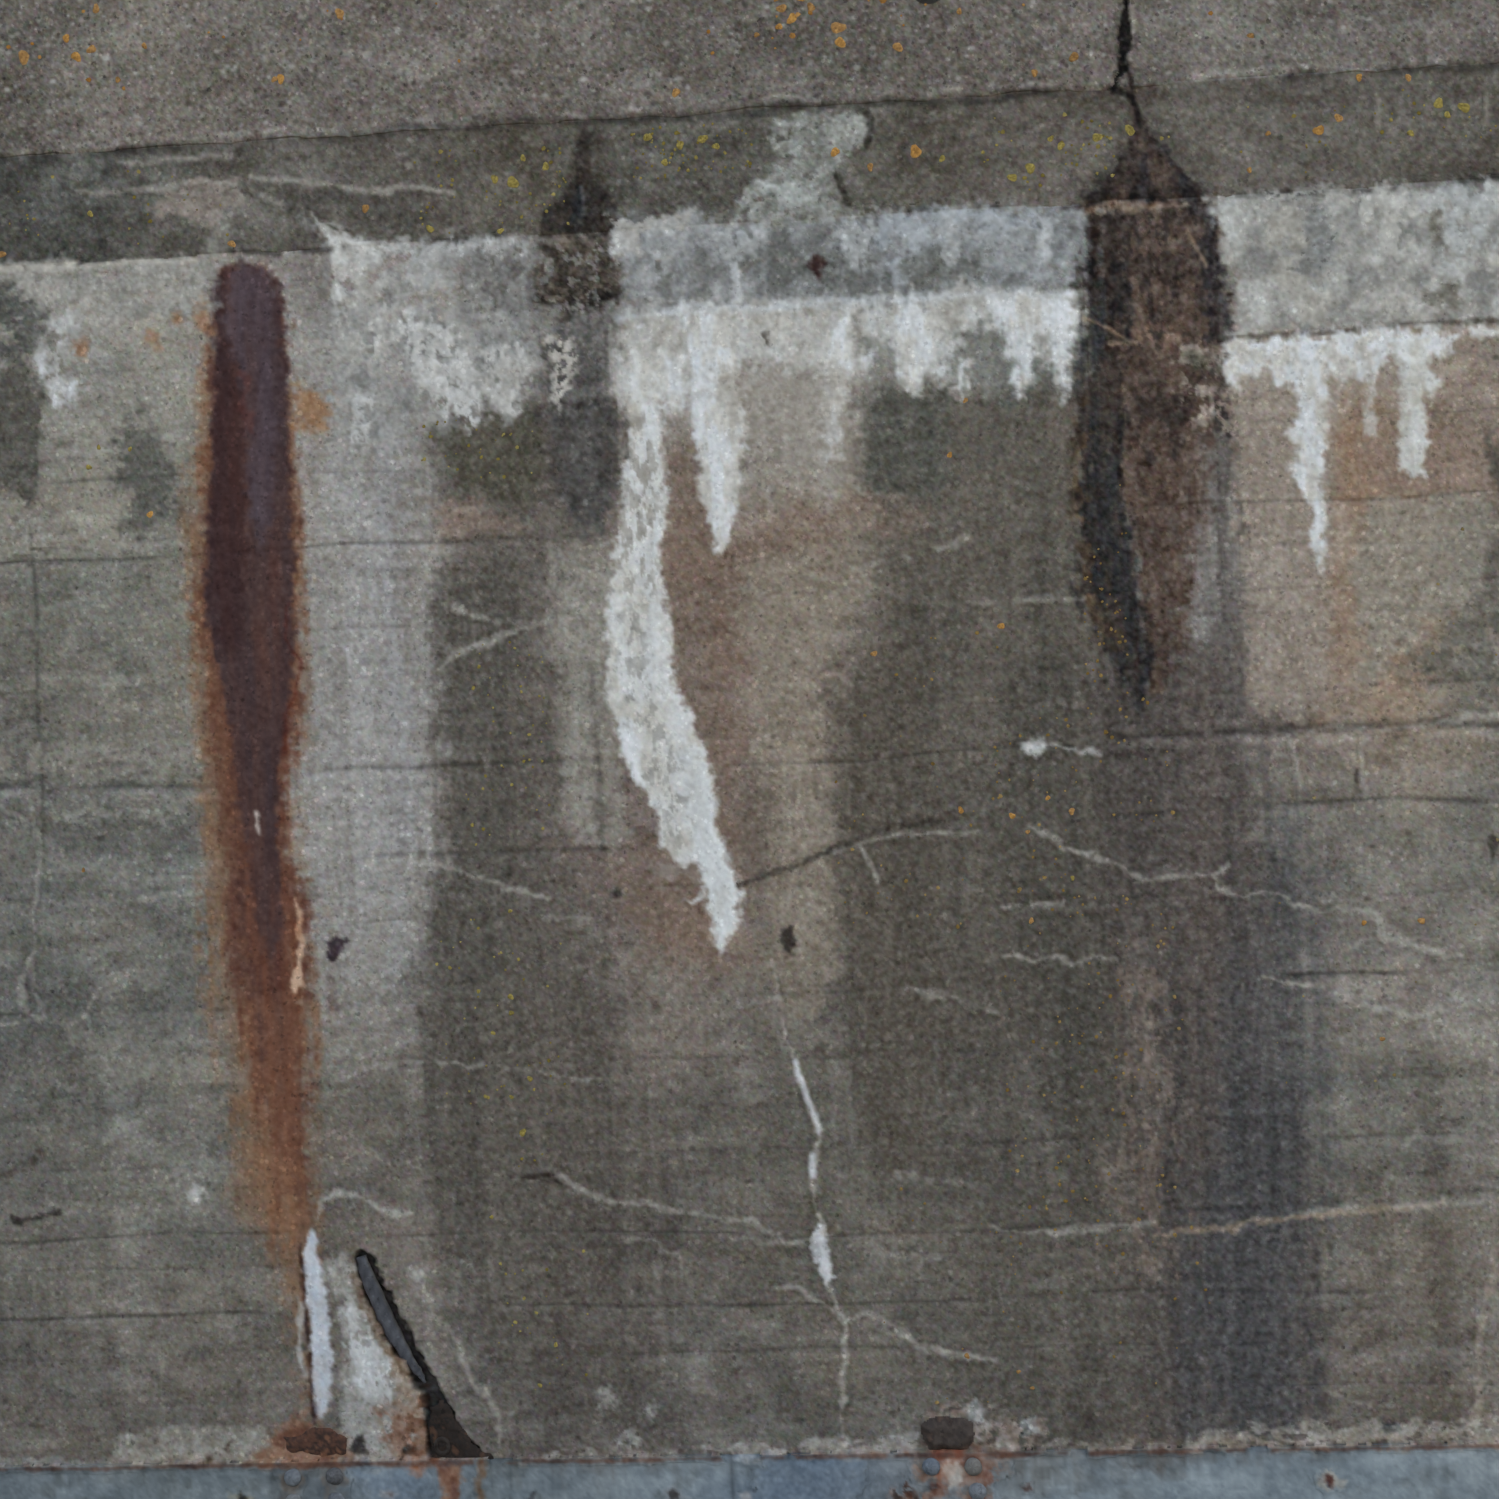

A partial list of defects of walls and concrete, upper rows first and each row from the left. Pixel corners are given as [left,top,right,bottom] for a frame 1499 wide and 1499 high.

crack [1108,0,1145,132]
damp [0,243,229,509]
rust [0,256,726,1499]
crack [362,854,597,925]
damp [279,90,1499,1459]
crack [1024,820,1468,1064]
crack [327,1057,608,1087]
crack [494,949,1416,1439]
spalling [323,1246,481,1460]
rust [863,1438,1499,1499]